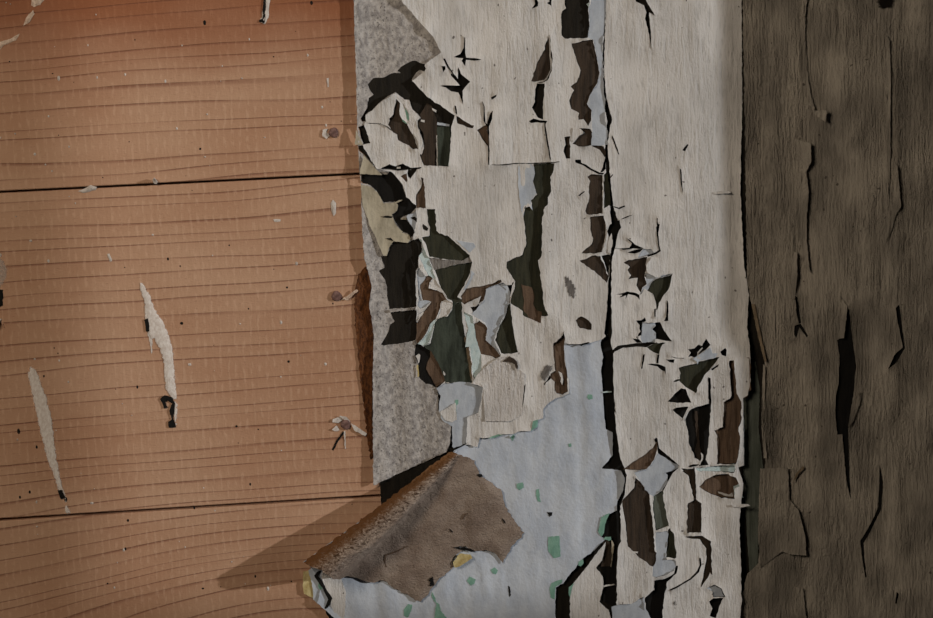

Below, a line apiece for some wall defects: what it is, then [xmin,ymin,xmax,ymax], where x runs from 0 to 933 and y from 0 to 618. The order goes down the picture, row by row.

peeling [532,35,553,119]
peeling [561,0,608,158]
peeling [355,61,555,449]
peeling [541,333,568,394]
peeling [565,277,576,298]
peeling [576,317,592,329]
peeling [580,172,611,282]
peeling [624,218,672,309]
peeling [612,304,807,618]
peeling [432,593,446,618]
peeling [548,536,561,558]
peeling [549,579,573,599]